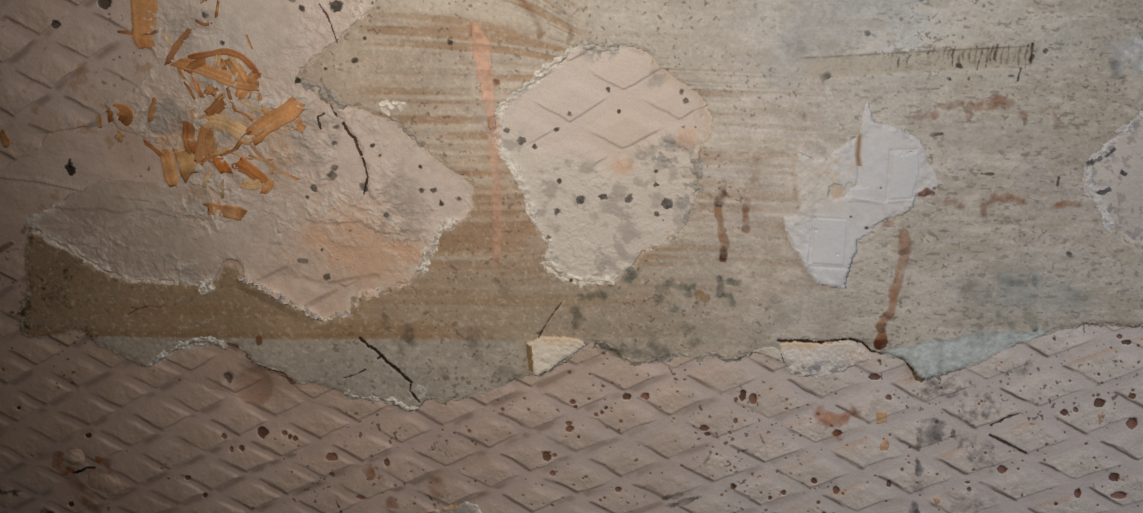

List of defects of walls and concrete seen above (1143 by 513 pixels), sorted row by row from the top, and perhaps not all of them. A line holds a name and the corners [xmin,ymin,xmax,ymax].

spalling [25,0,474,325]
crack [317,105,369,195]
spalling [491,41,712,288]
spalling [1081,103,1143,249]
corrosion [715,190,728,262]
spalling [148,336,427,414]
crack [344,337,420,403]
flaking render [526,336,880,380]
corrosion [874,280,898,349]
spalling [908,367,925,383]
spalling [1088,321,1143,345]